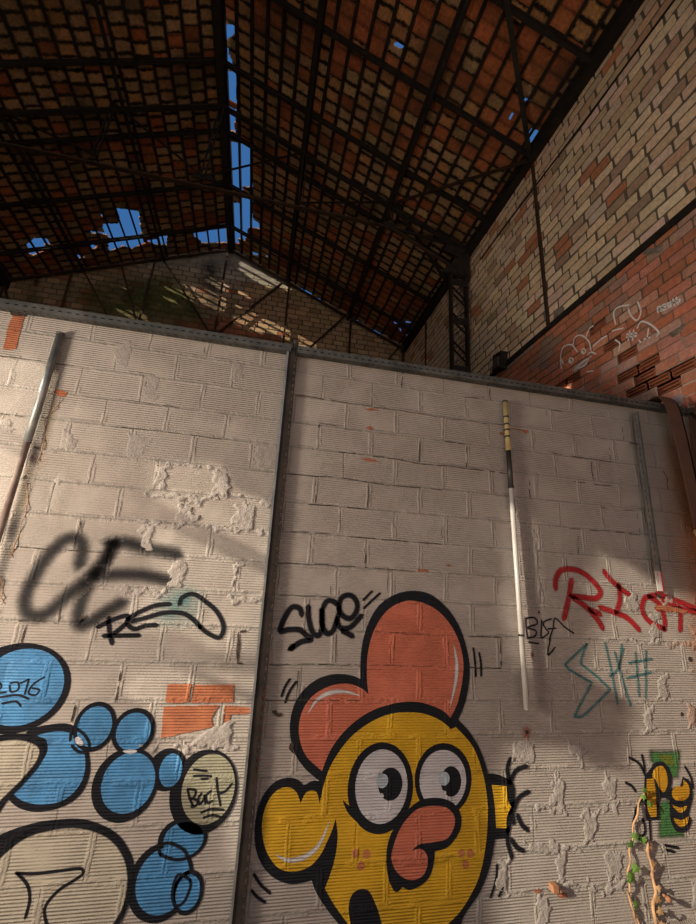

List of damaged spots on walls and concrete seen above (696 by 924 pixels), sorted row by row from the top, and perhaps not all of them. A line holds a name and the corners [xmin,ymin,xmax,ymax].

peeling [161,681,282,782]